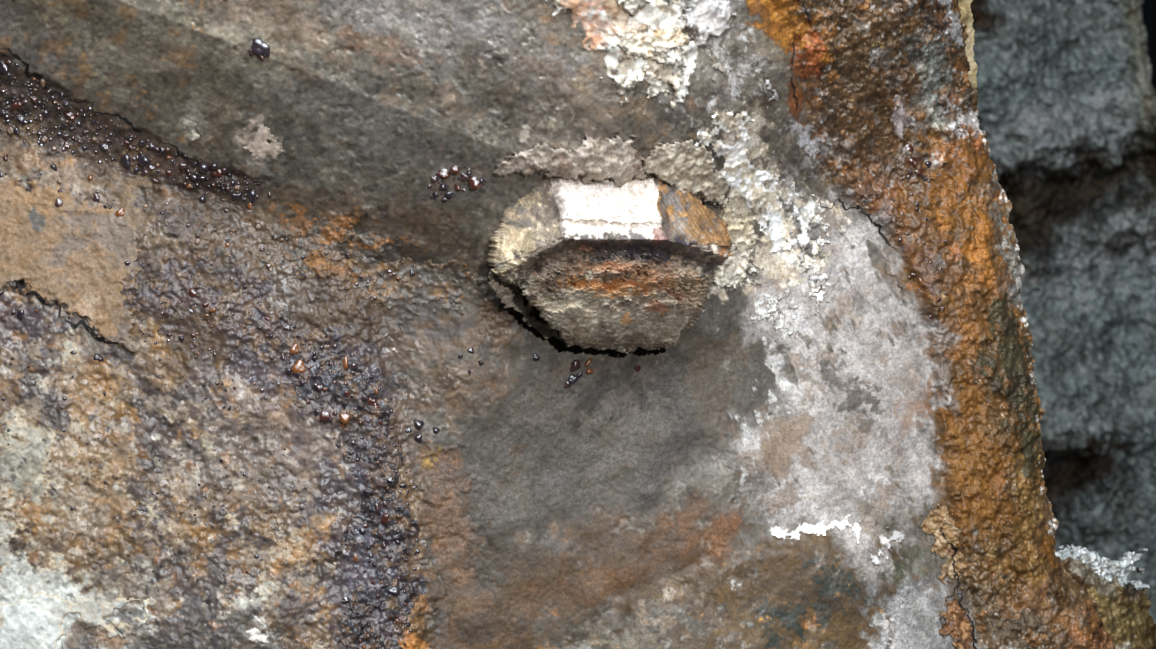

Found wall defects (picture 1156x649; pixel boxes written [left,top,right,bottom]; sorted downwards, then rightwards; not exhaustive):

corrosion [248,38,270,60]
corrosion [746,0,835,127]
damp [947,100,985,141]
corrosion [970,0,1006,34]
corrosion [0,59,896,649]
damp [435,0,964,649]
corrosion [865,115,1156,544]
corrosion [1041,536,1059,587]